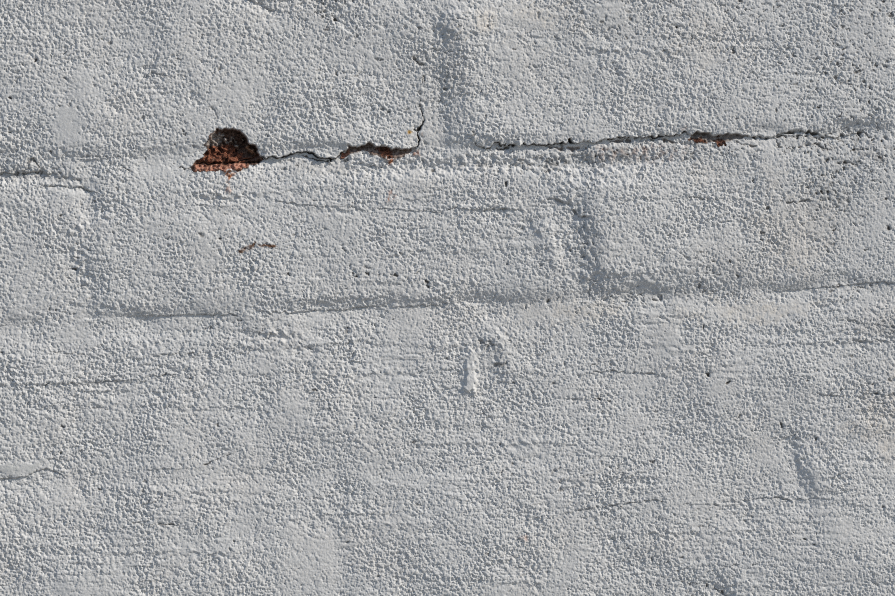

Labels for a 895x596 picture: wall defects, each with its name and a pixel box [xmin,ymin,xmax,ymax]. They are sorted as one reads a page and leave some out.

spalling [177,127,265,173]
crack [259,149,346,163]
crack [475,130,690,153]